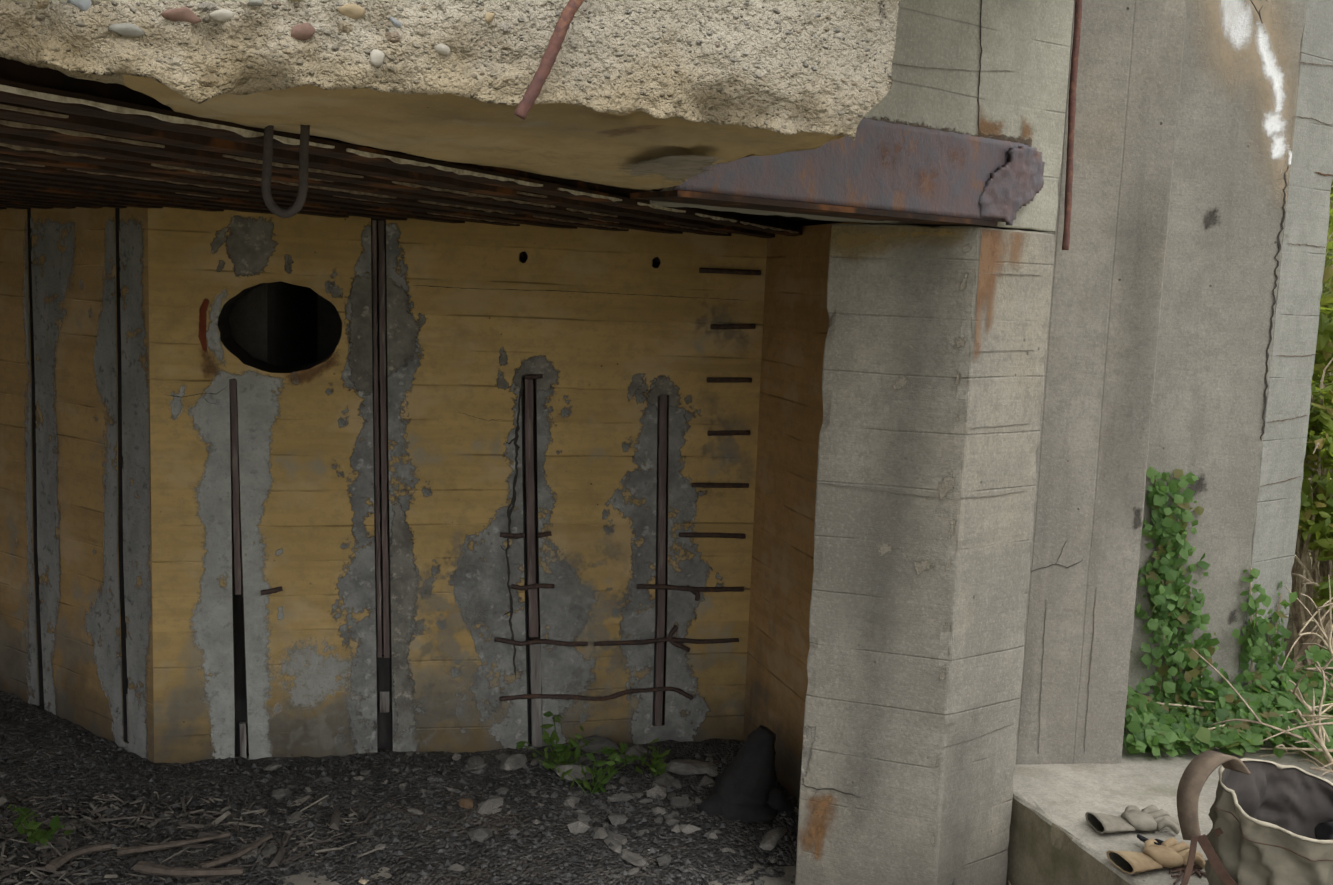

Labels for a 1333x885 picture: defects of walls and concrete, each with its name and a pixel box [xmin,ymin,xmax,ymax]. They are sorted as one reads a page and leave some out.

corrosion [863,116,1032,147]
damp [1205,0,1292,188]
corrosion [975,229,1021,353]
crack [1260,168,1333,441]
peeling [17,217,83,715]
peeling [85,218,151,760]
peeling [170,215,749,760]
corrosion [803,796,832,859]